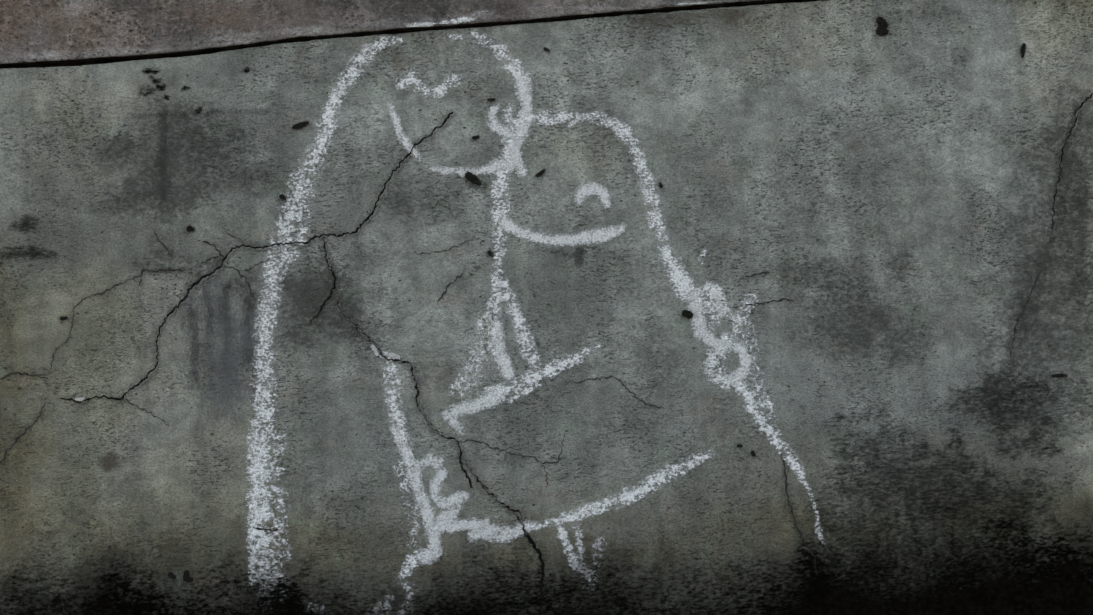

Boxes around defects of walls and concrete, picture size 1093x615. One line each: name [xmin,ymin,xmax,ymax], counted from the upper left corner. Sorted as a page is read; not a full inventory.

crack [1051,93,1092,230]
crack [0,112,565,595]
damp [950,370,1061,458]
crack [1010,273,1040,356]
damp [0,409,1093,615]